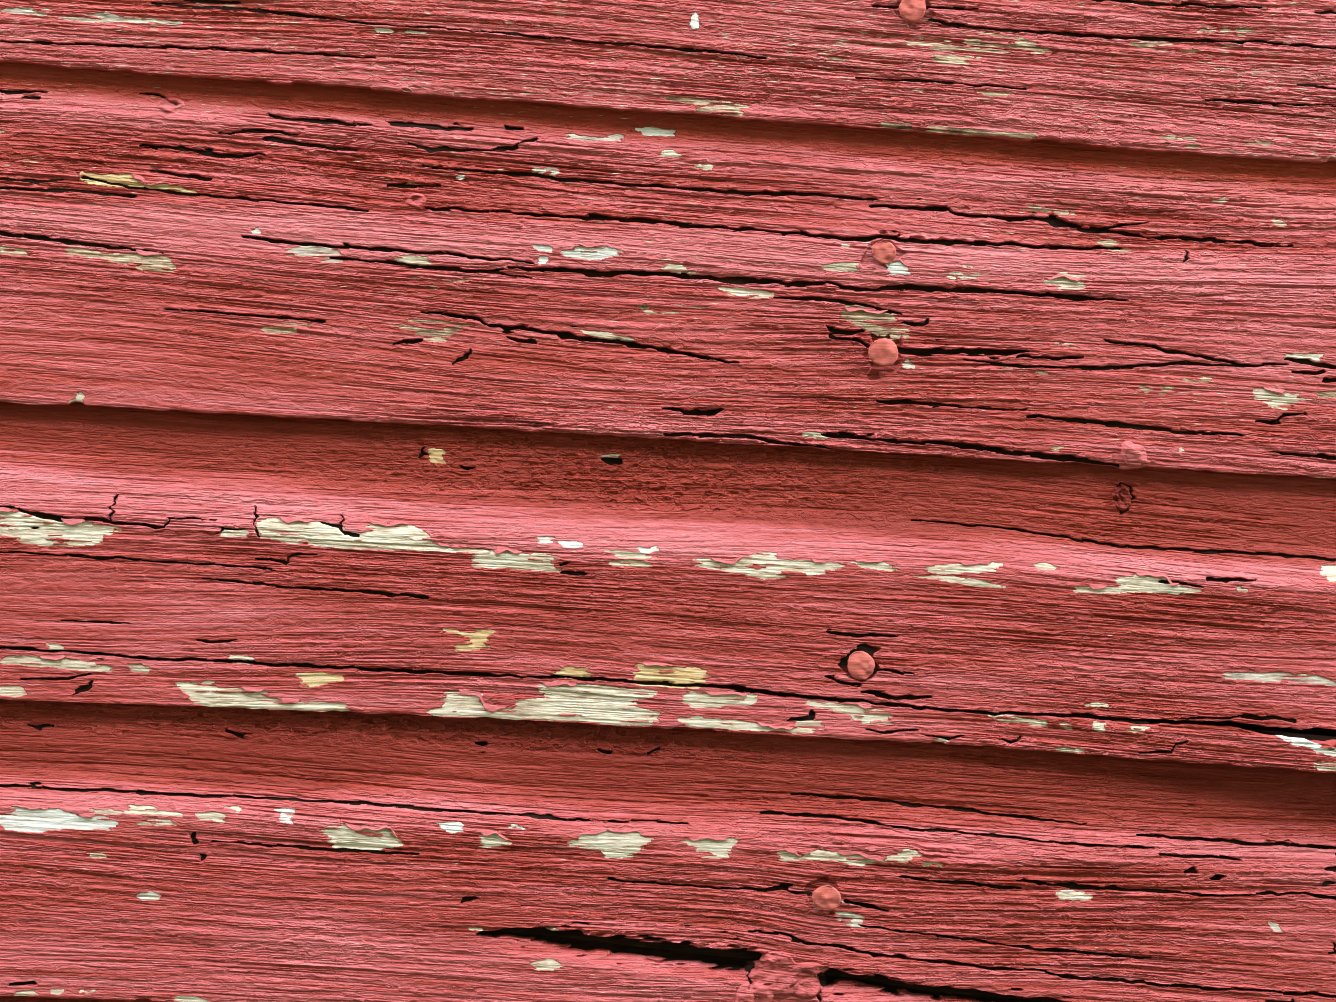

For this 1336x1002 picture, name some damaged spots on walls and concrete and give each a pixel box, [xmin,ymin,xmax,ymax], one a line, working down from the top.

peeling [0,507,122,547]
peeling [220,516,585,572]
peeling [693,551,899,580]
peeling [1073,571,1202,595]
peeling [173,672,350,711]
peeling [427,662,893,734]
peeling [1275,735,1336,771]
peeling [0,804,242,833]
peeling [322,823,404,851]
crack [759,793,1336,900]
crack [608,877,812,895]
crack [477,899,1336,1002]